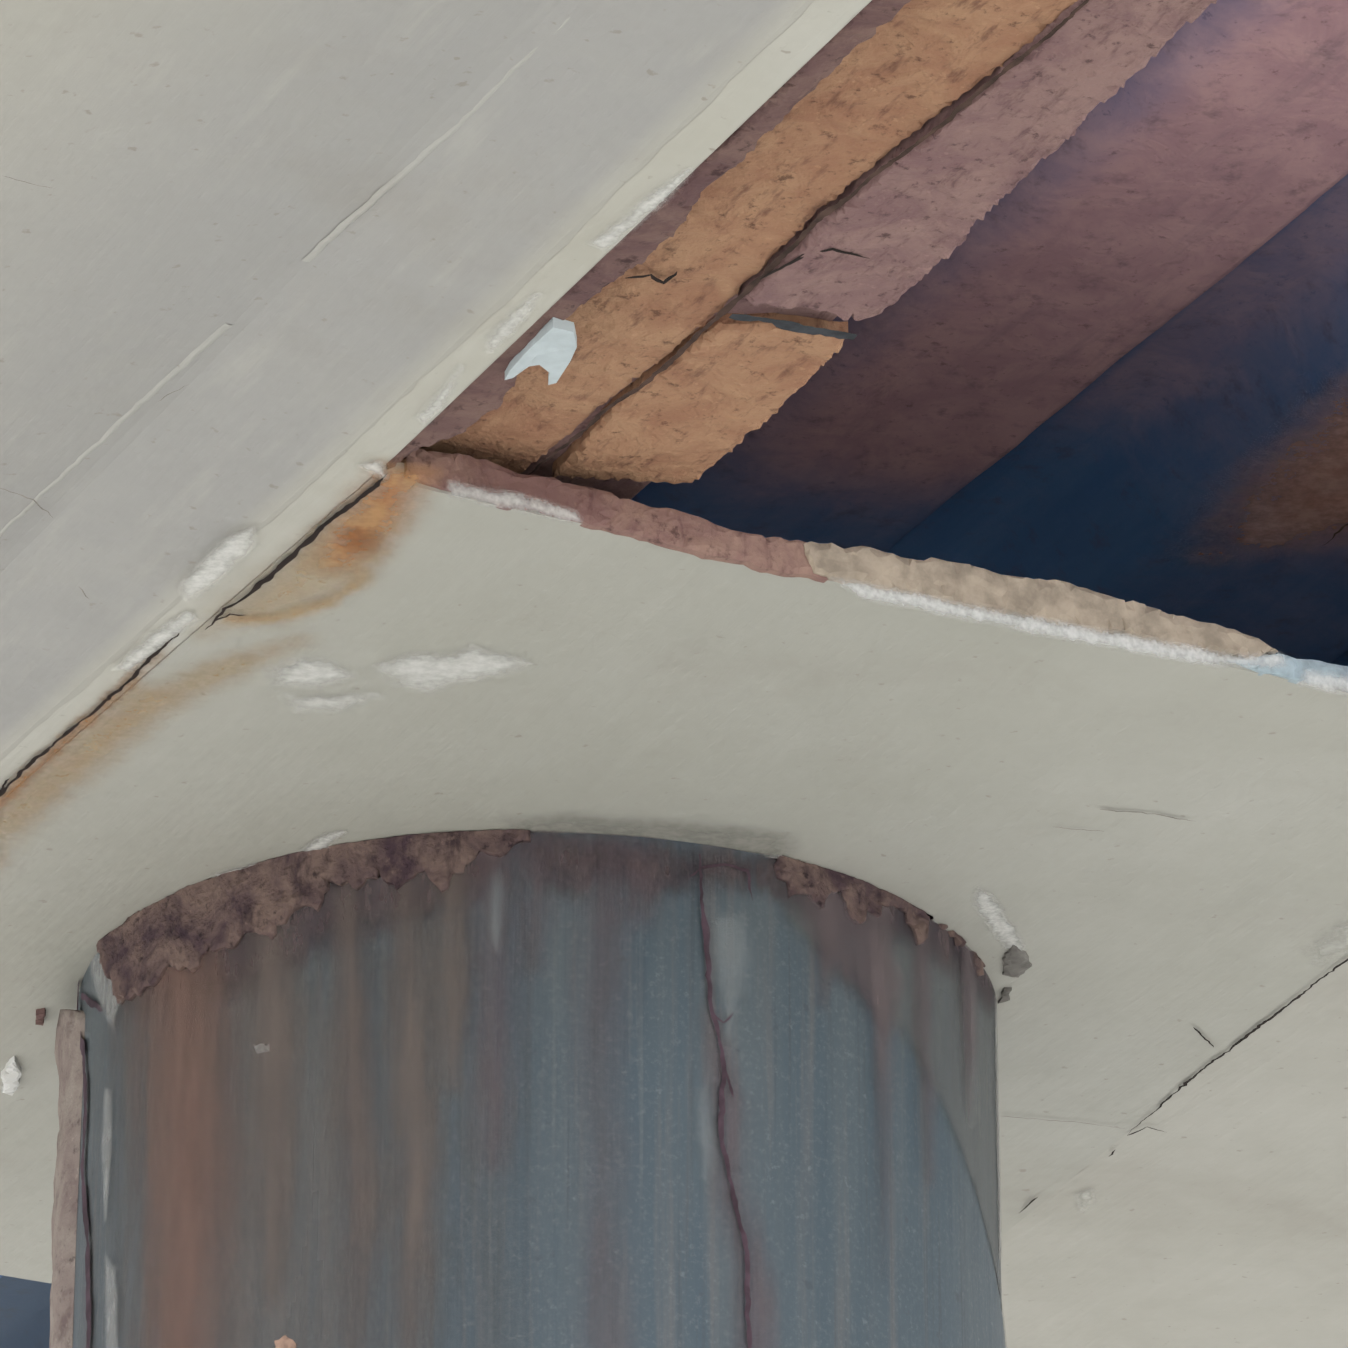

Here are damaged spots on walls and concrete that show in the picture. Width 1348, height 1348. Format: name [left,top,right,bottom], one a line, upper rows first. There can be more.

peeling [595,175,683,247]
peeling [505,317,577,385]
peeling [121,613,192,669]
crack [0,474,387,797]
peeling [185,532,252,595]
corrosion [268,470,419,602]
peeling [451,484,579,521]
peeling [804,541,1348,691]
corrosion [96,829,997,1066]
crack [688,854,753,1348]
peeling [867,892,1032,1310]
crack [1110,959,1348,1156]